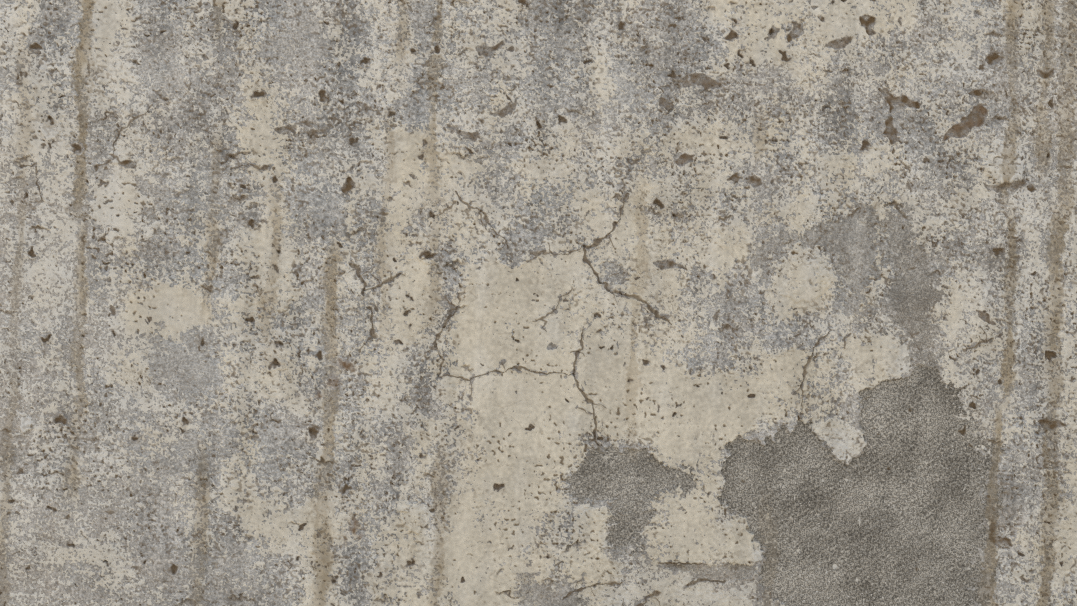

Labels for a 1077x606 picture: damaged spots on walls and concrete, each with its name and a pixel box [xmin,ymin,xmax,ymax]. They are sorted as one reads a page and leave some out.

crack [431,292,608,448]
crack [426,189,675,334]
spalling [509,195,1015,606]
damp [975,0,1077,606]